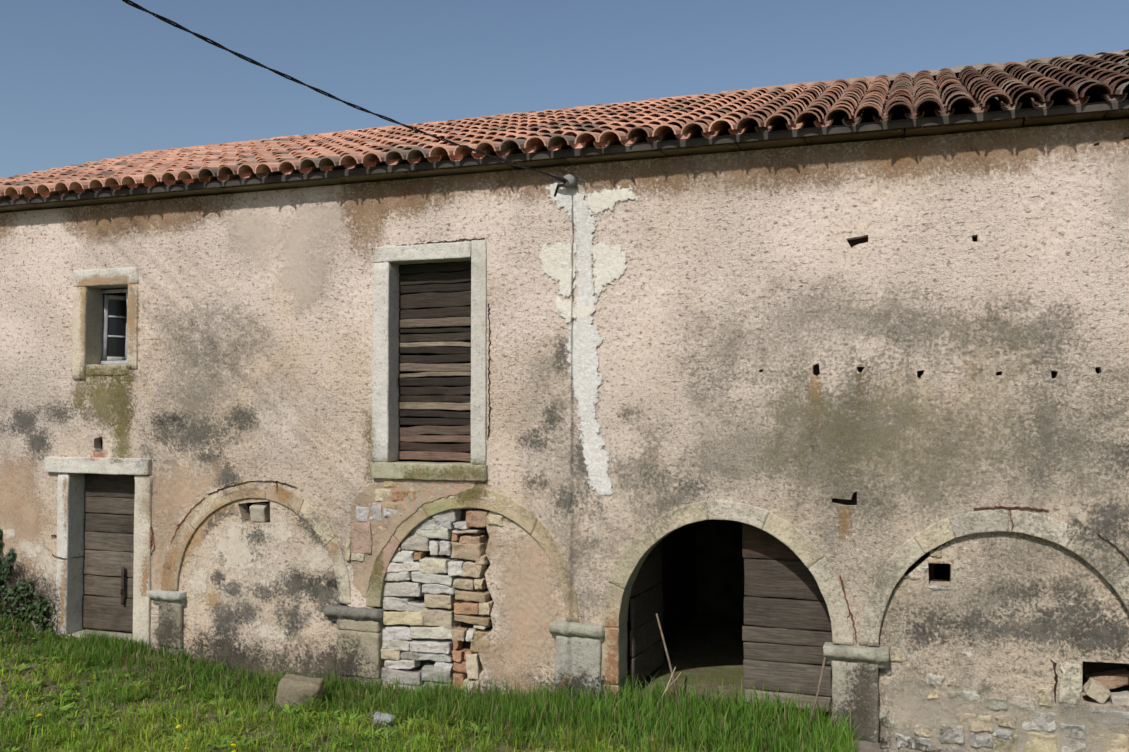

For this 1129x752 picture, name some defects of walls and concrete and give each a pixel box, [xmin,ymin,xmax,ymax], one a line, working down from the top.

peeling [538,176,640,323]
leakage [0,373,136,462]
leakage [145,404,258,486]
peeling [142,465,217,584]
leakage [242,526,270,561]
leakage [287,505,328,551]
spalling [187,478,493,602]
spalling [896,550,954,591]
crack [1098,533,1129,564]
leakage [152,551,378,687]
peeling [249,619,289,644]
spalling [879,662,1129,752]